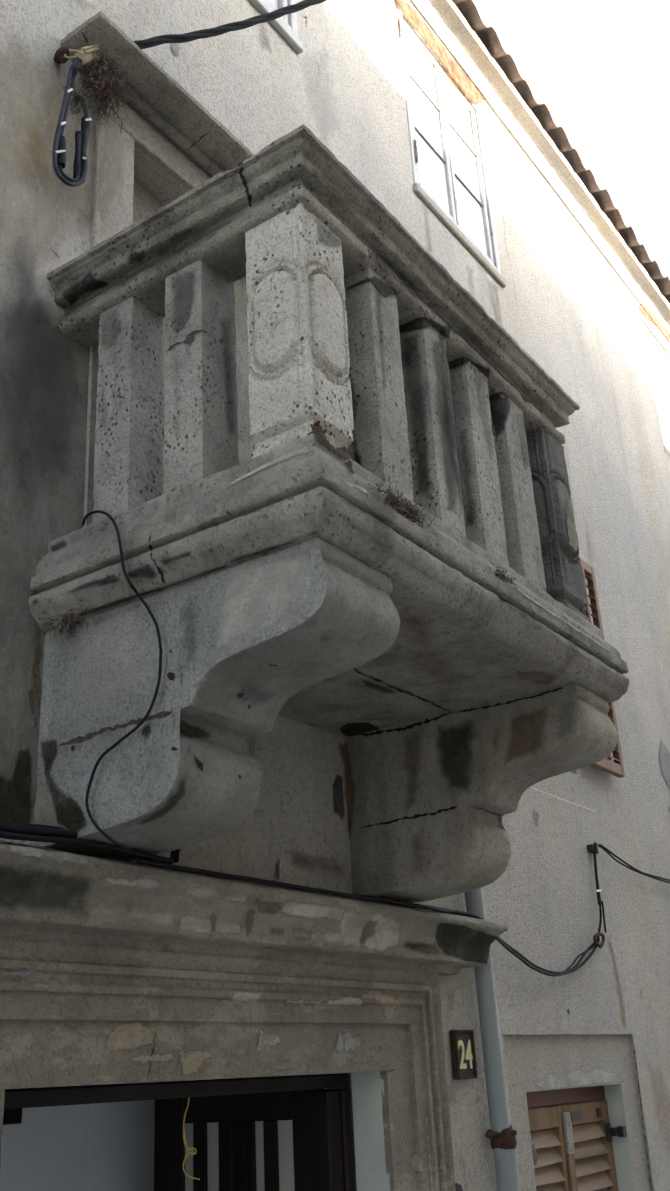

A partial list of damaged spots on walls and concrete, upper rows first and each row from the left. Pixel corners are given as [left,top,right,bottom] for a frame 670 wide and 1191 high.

crack [238,162,252,207]
water stain [63,271,108,305]
water stain [11,292,63,471]
water stain [70,541,294,616]
crack [354,668,562,736]
water stain [507,711,544,760]
peeling [332,775,345,819]
crack [359,806,504,828]
peeling [287,990,401,1020]
peeling [104,1022,236,1076]